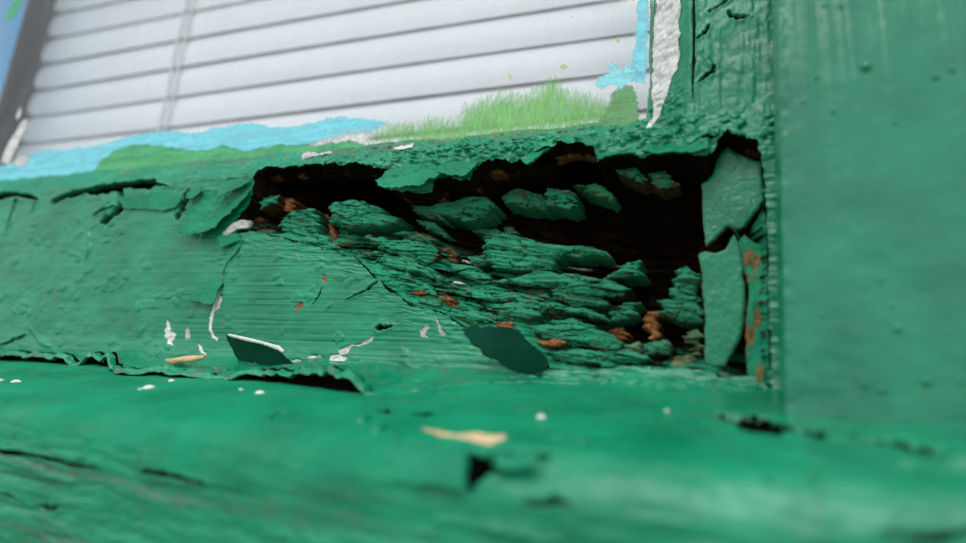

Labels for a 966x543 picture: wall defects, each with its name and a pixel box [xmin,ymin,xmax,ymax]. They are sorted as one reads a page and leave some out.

crack [692,0,749,87]
crack [81,182,166,218]
spalling [116,140,771,389]
crack [0,449,99,469]
crack [145,471,207,486]
spalling [387,429,551,492]
crack [0,493,59,511]